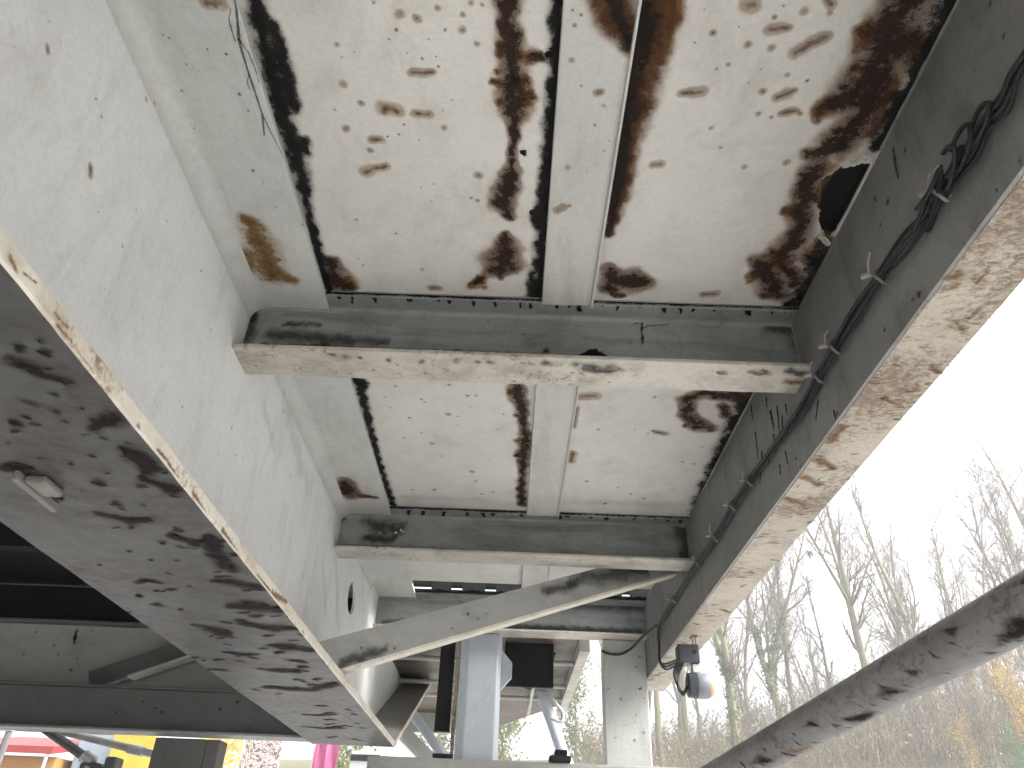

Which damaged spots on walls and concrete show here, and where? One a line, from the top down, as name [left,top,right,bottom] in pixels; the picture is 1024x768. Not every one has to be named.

crack [228,0,283,157]
water stain [271,20,302,115]
corrosion [325,0,547,301]
corrosion [572,0,683,238]
corrosion [594,0,936,310]
corrosion [238,213,299,285]
water stain [525,270,536,298]
crack [633,322,668,345]
corrosion [337,478,379,499]
corrosion [390,374,532,513]
corrosion [677,390,856,487]